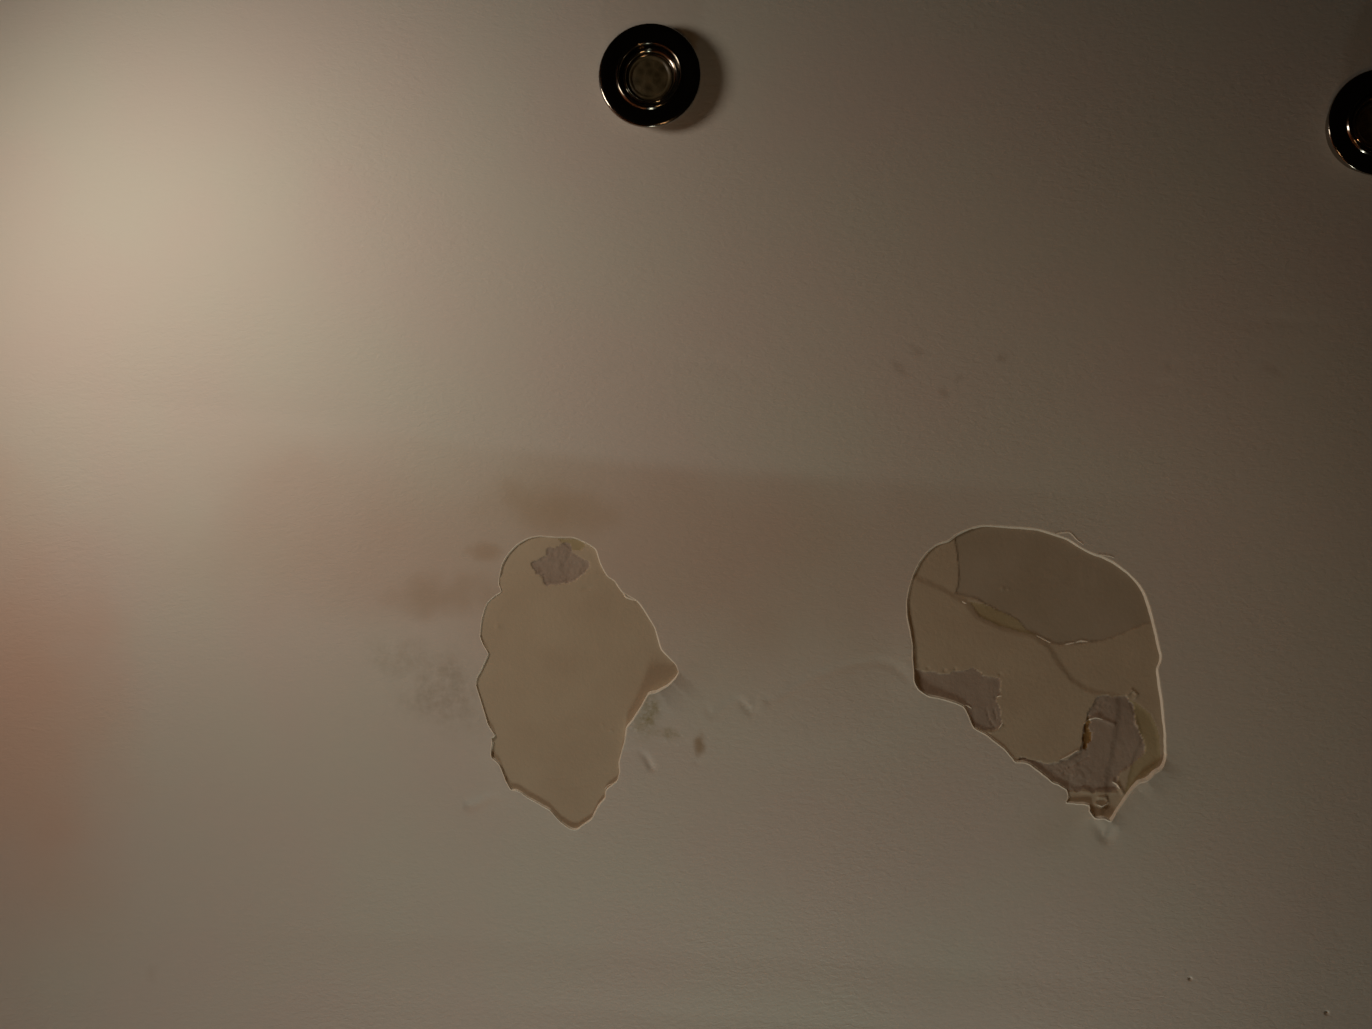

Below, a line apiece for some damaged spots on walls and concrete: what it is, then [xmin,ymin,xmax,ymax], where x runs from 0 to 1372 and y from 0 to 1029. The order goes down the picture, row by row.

peeling [476,535,679,831]
peeling [906,525,1168,822]